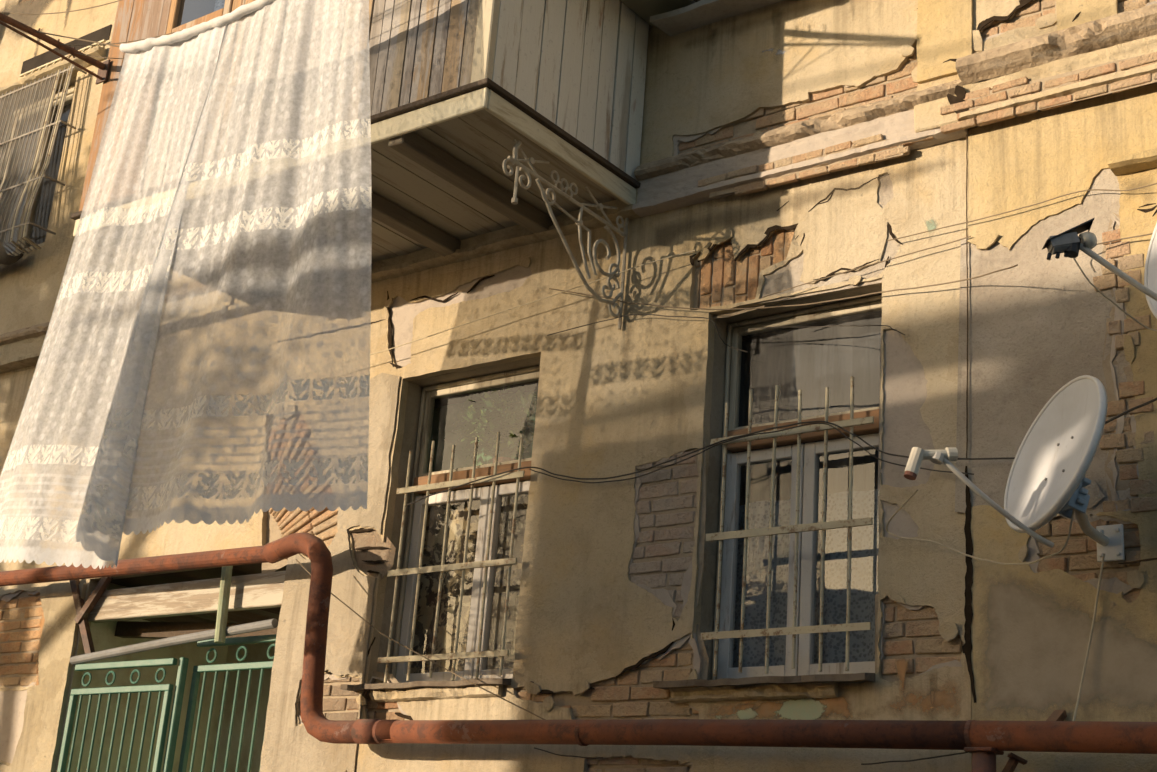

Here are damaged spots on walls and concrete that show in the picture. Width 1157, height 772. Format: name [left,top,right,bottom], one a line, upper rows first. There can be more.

flaking render [972,0,1057,52]
flaking render [673,45,918,156]
flaking render [698,52,1157,208]
flaking render [694,228,900,318]
crack [371,275,495,368]
peeling [955,168,1157,603]
peeling [878,330,935,539]
flaking render [262,558,288,573]
flaking render [266,506,396,581]
flaking render [0,590,43,763]
flaking render [515,624,709,720]
crack [588,618,675,690]